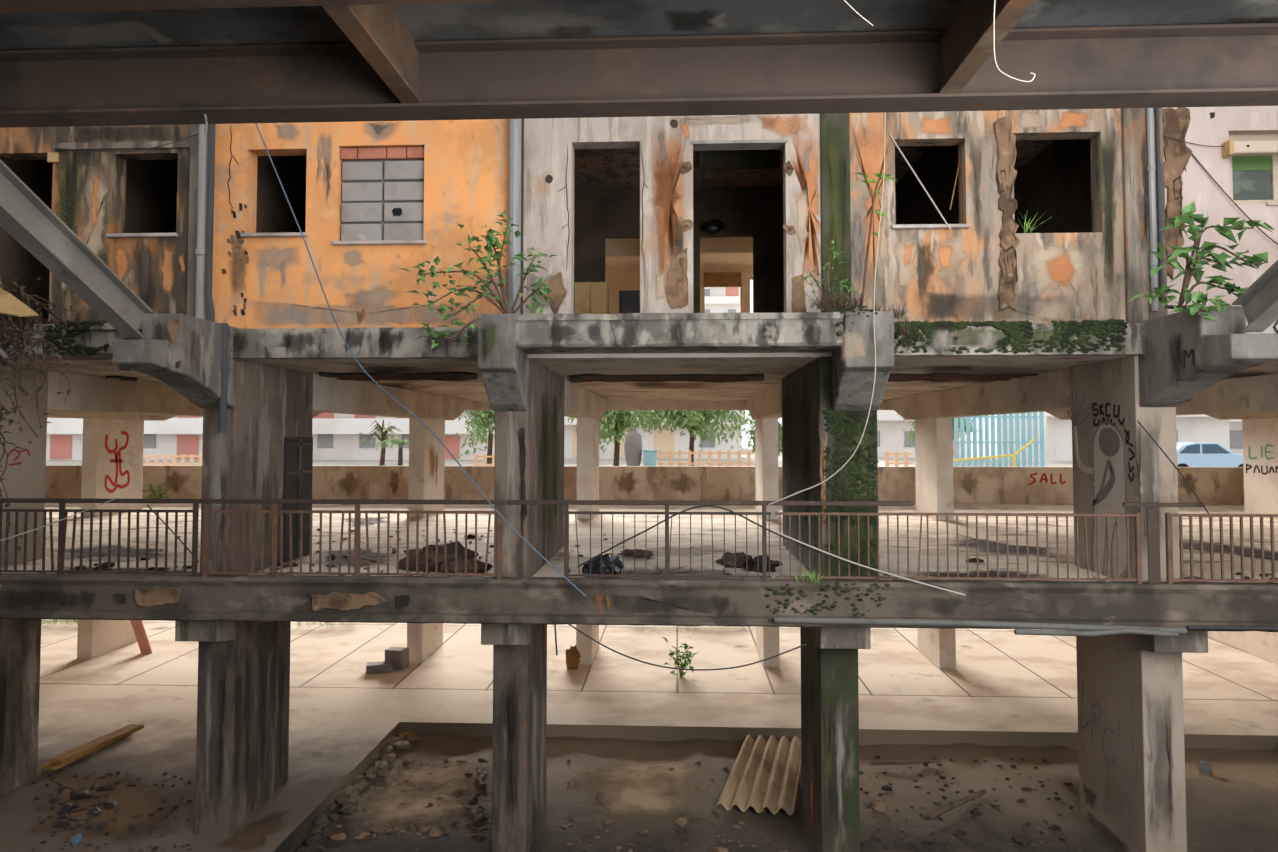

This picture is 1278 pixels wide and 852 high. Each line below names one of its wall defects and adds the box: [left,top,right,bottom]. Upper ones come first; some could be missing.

leakage [65,165,75,229]
leakage [135,253,155,302]
peeling [222,203,249,316]
leakage [233,333,248,351]
leakage [272,288,461,352]
leakage [483,271,508,299]
flaking render [530,272,567,314]
corrosion [655,160,683,281]
peeling [654,119,693,309]
peeling [783,146,819,312]
peeling [853,139,917,286]
flaking render [993,112,1087,312]